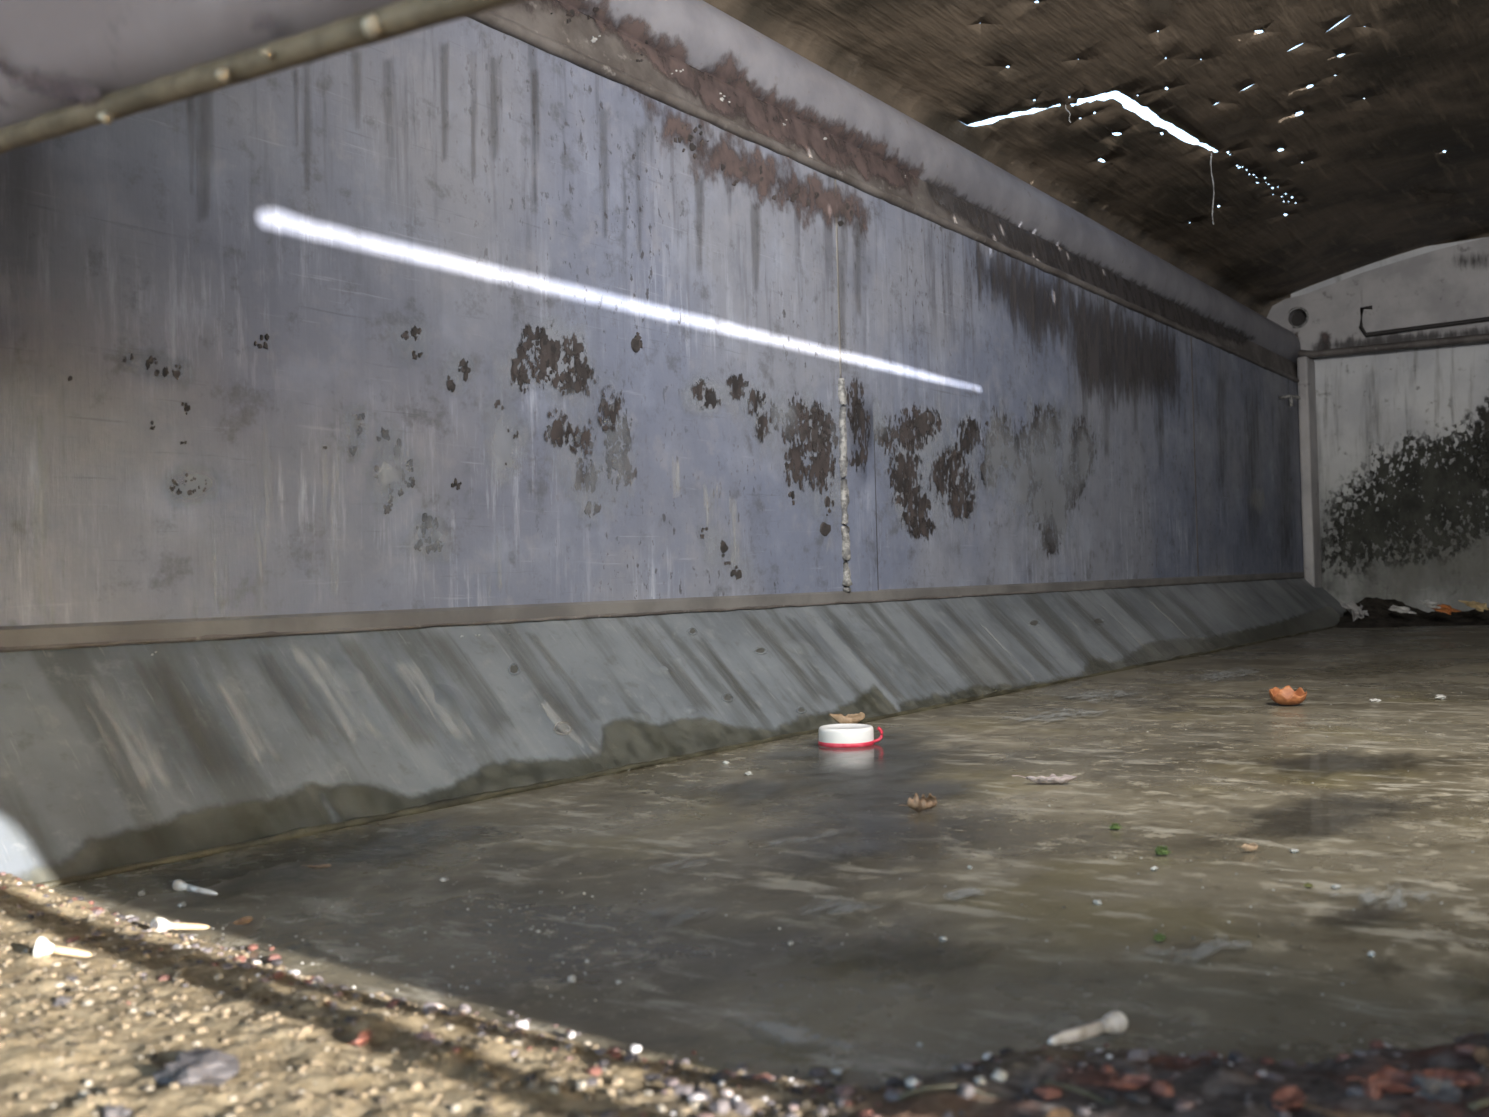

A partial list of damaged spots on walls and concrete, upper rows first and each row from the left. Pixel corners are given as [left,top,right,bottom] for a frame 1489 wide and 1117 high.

corrosion [541,0,1253,343]
water stain [977,242,1180,400]
water stain [1321,397,1489,602]